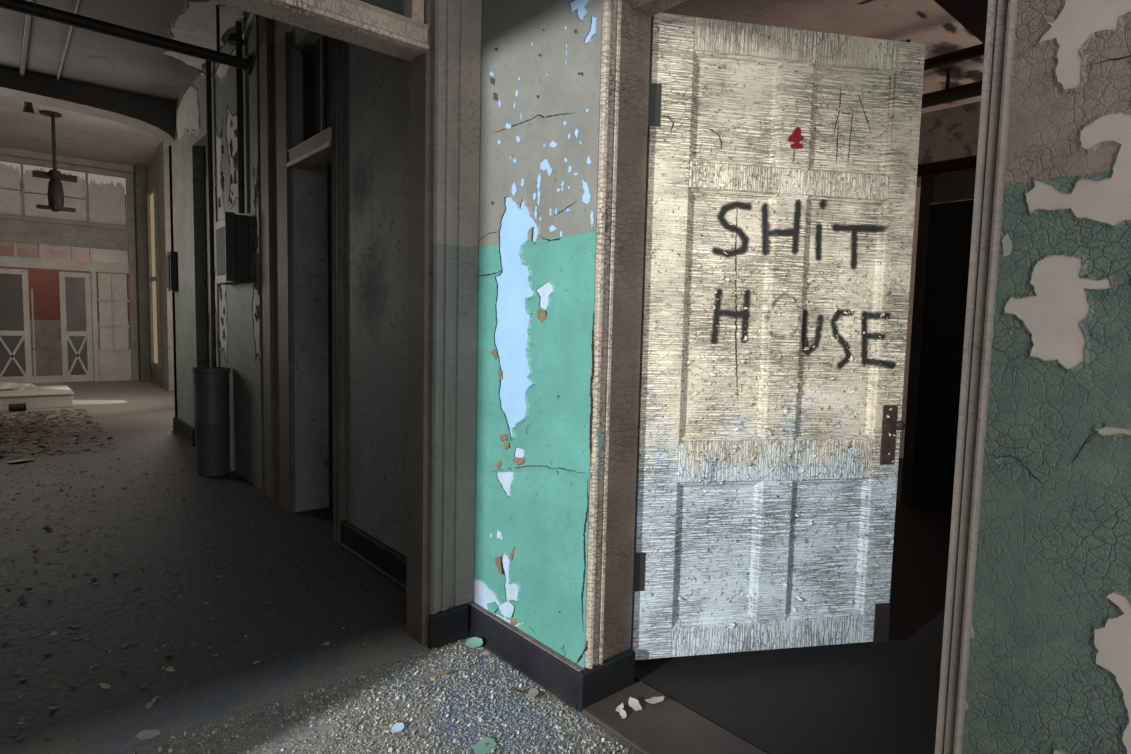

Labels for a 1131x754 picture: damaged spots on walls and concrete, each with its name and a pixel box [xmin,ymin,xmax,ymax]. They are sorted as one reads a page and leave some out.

peeling [565,0,598,76]
peeling [490,71,522,144]
crack [493,113,576,138]
peeling [1021,99,1131,230]
peeling [1002,234,1012,256]
peeling [490,121,594,500]
peeling [1001,251,1131,374]
crack [488,312,594,663]
peeling [473,531,523,626]
peeling [465,637,483,648]
peeling [1088,587,1131,754]